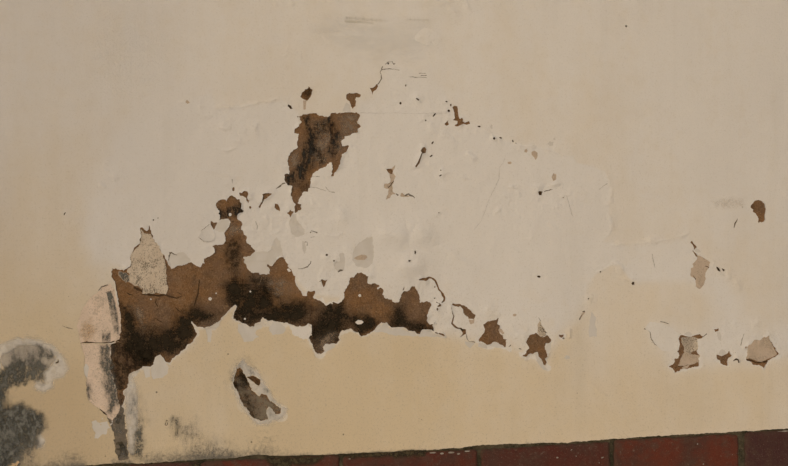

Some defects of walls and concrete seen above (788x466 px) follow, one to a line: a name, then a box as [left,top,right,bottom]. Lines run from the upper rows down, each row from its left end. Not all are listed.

peeling [751,200,765,223]
peeling [77,87,445,460]
peeling [690,241,710,289]
peeling [451,304,564,370]
peeling [669,329,731,372]
peeling [745,336,778,368]
damp [0,338,67,466]